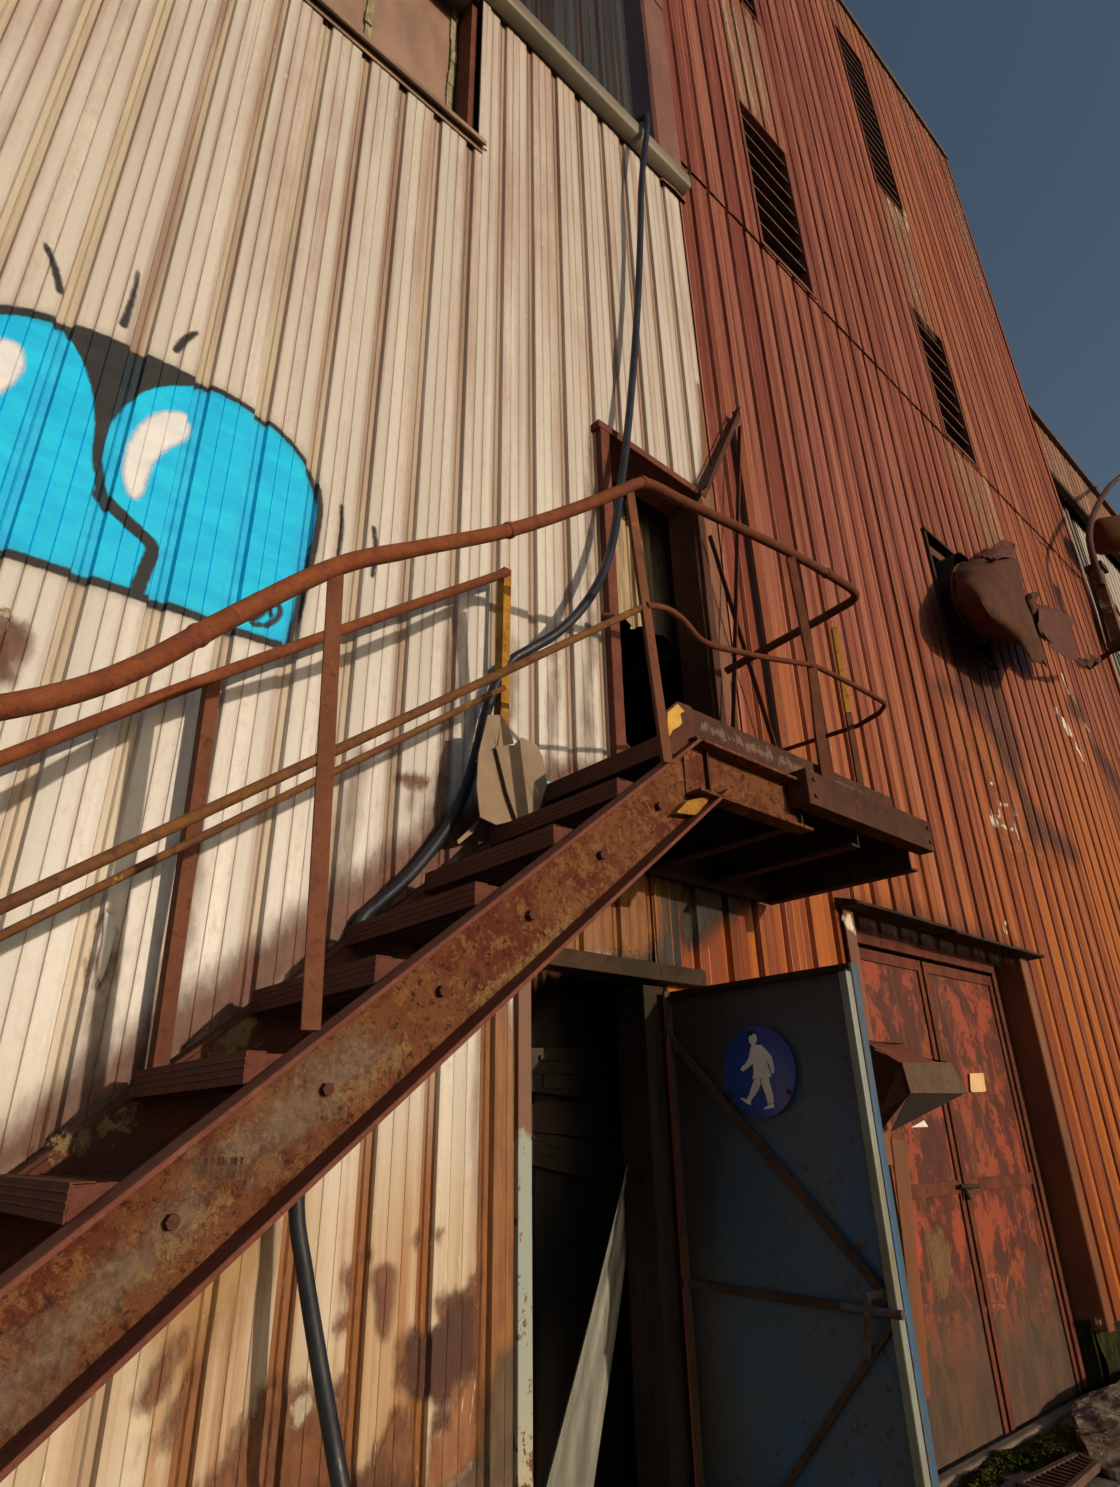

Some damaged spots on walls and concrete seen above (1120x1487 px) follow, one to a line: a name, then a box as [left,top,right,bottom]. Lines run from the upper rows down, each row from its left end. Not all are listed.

rust [0,607,30,680]
rust [427,1002,515,1487]
rust [923,1225,955,1303]